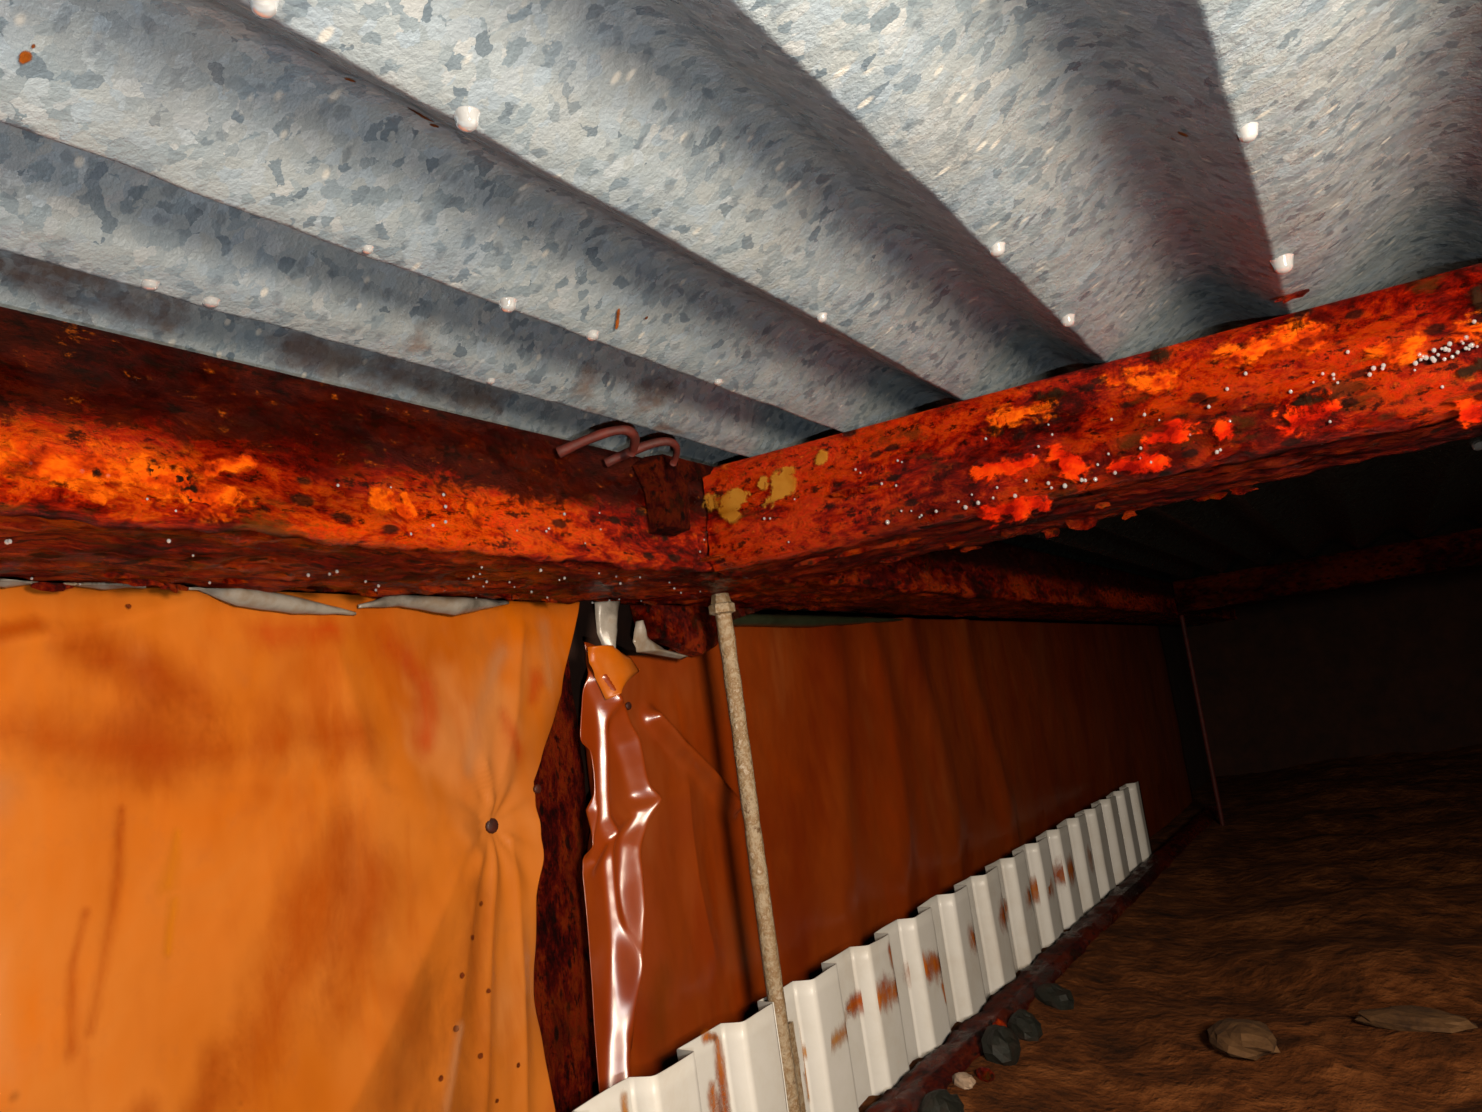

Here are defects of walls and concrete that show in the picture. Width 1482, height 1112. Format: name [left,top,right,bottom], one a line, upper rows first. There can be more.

corrosion [1274,289,1310,304]
corrosion [1193,485,1258,501]
corrosion [1042,502,1137,539]
corrosion [943,540,982,552]
corrosion [30,582,73,592]
corrosion [102,572,189,594]
corrosion [923,954,946,1001]
corrosion [831,944,898,1046]
corrosion [703,1032,729,1112]